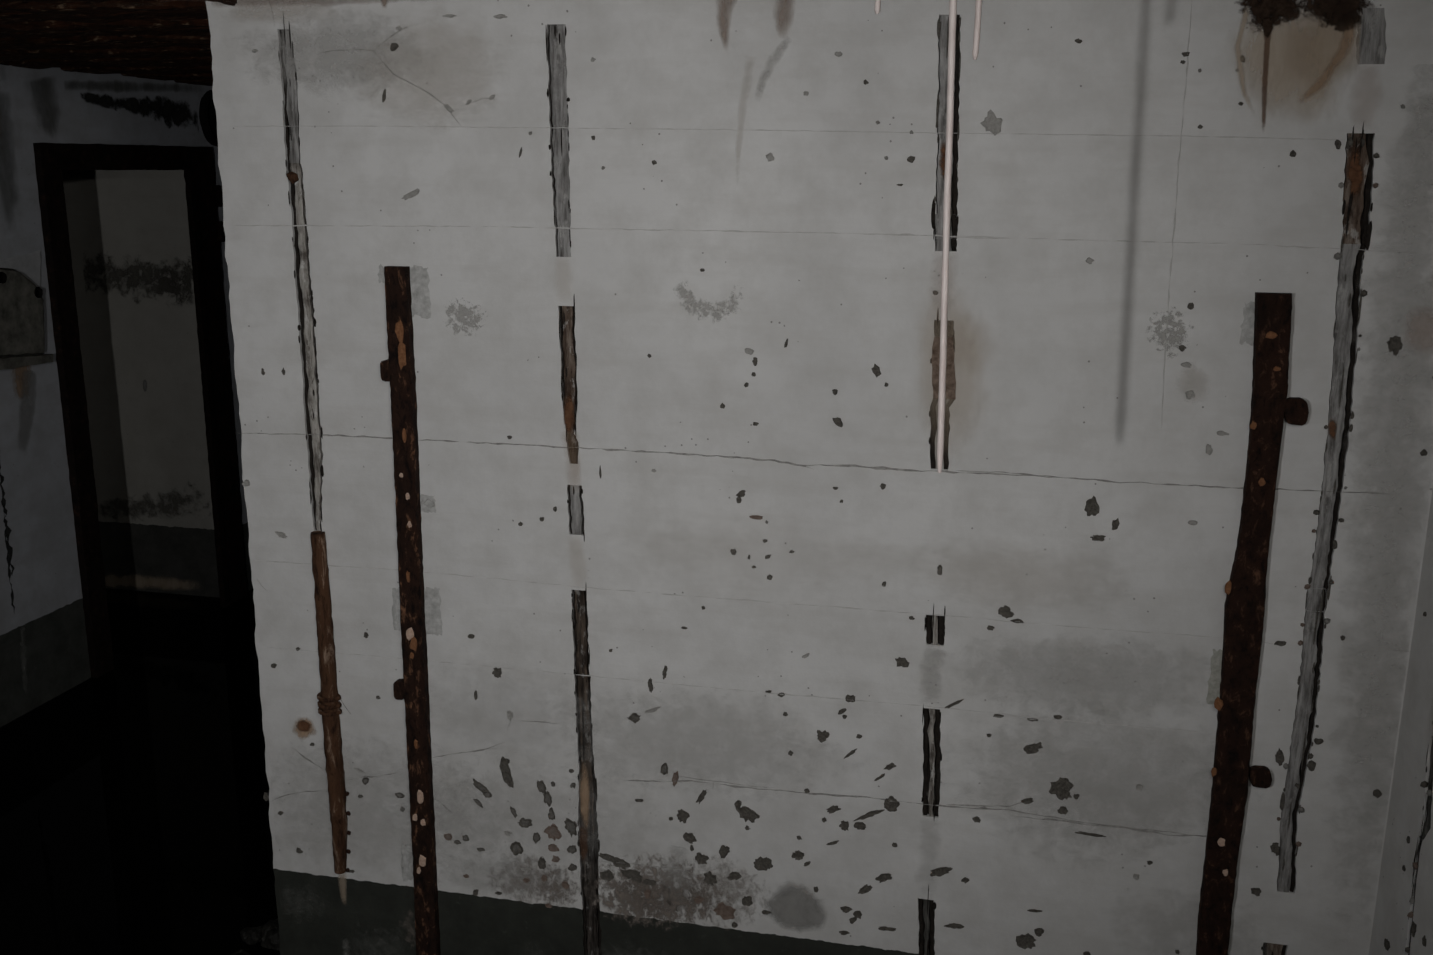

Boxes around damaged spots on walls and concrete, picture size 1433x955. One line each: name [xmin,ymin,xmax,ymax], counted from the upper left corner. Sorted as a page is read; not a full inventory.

mould [1239,0,1372,37]
spalling [937,17,961,80]
spalling [931,196,959,250]
spalling [298,291,319,395]
corrosion [395,320,406,369]
spalling [744,348,757,387]
spalling [730,490,773,580]
corrosion [406,627,417,659]
corrosion [296,719,313,737]
corrosion [413,790,426,826]
spalling [1049,777,1080,815]
spalling [921,867,970,929]